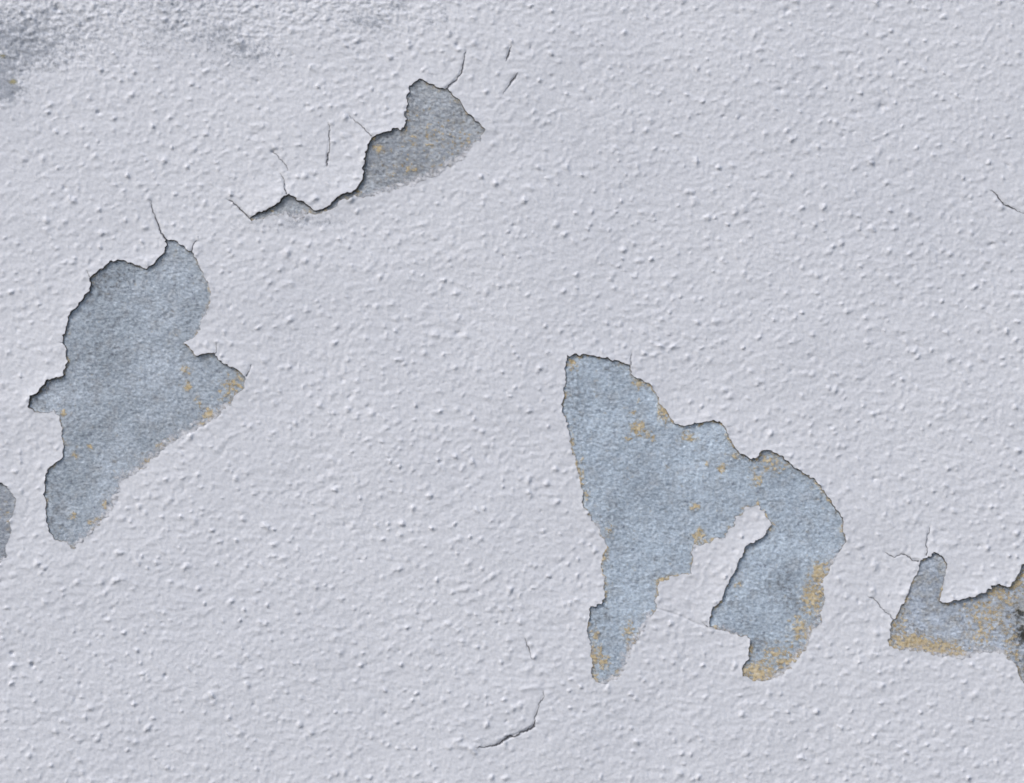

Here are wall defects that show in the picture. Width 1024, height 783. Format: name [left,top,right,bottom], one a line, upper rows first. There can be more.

peeling [227,52,485,222]
peeling [28,201,251,549]
peeling [0,482,16,563]
peeling [561,353,846,684]
peeling [869,527,1024,683]
crack [478,694,544,748]